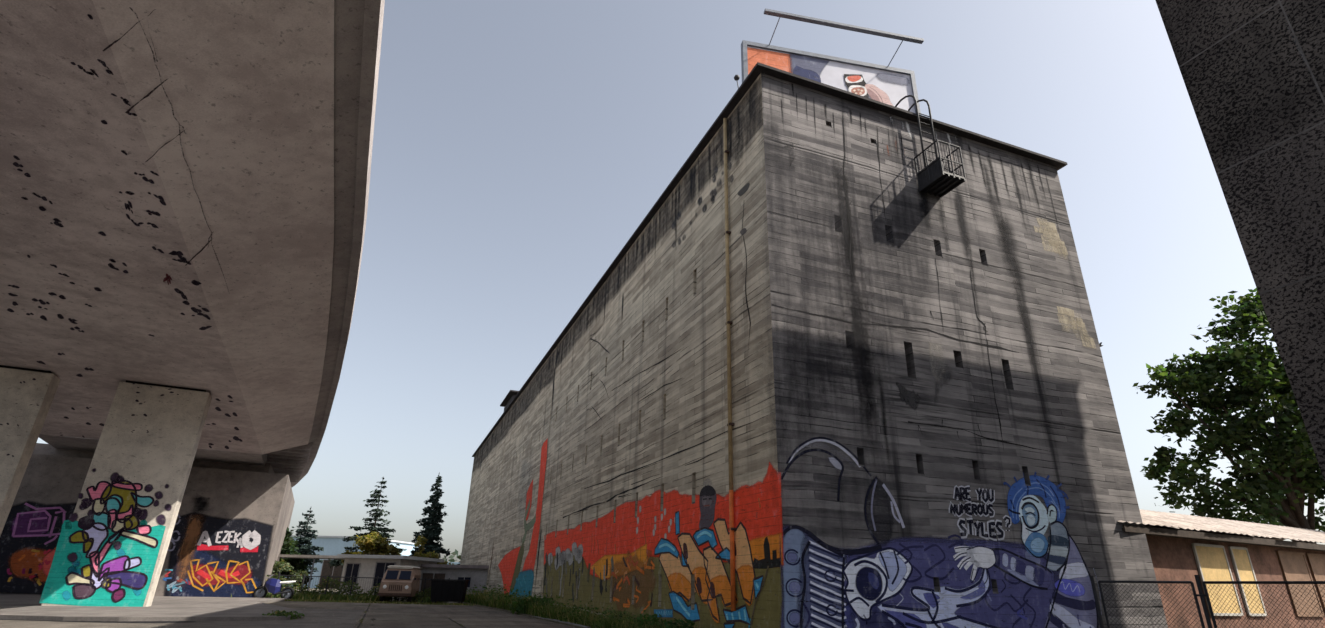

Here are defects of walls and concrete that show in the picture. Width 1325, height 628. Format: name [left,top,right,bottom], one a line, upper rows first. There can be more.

crack [103,7,230,294]
water stain [768,160,975,450]
water stain [936,133,1068,367]
water stain [1057,306,1096,348]